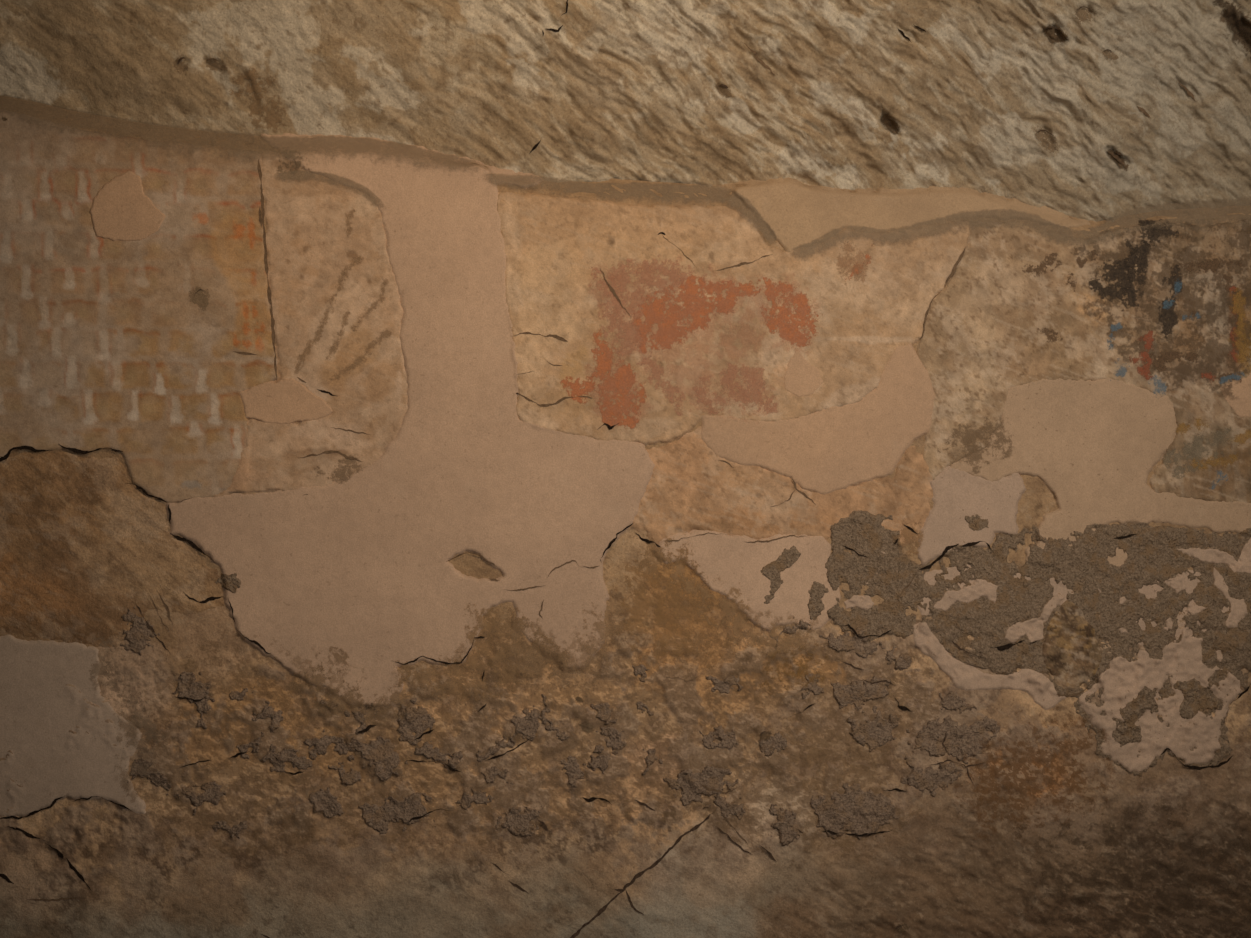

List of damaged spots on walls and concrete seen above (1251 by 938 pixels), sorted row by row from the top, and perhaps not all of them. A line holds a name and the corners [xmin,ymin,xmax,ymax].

crack [0,444,123,462]
spalling [0,451,241,656]
crack [129,483,216,563]
crack [134,594,282,663]
spalling [629,426,1251,797]
crack [0,796,131,901]
spalling [127,758,252,839]
spalling [229,687,626,818]
crack [493,863,528,893]
crack [570,782,777,938]
spalling [642,749,746,820]
spalling [768,783,902,846]